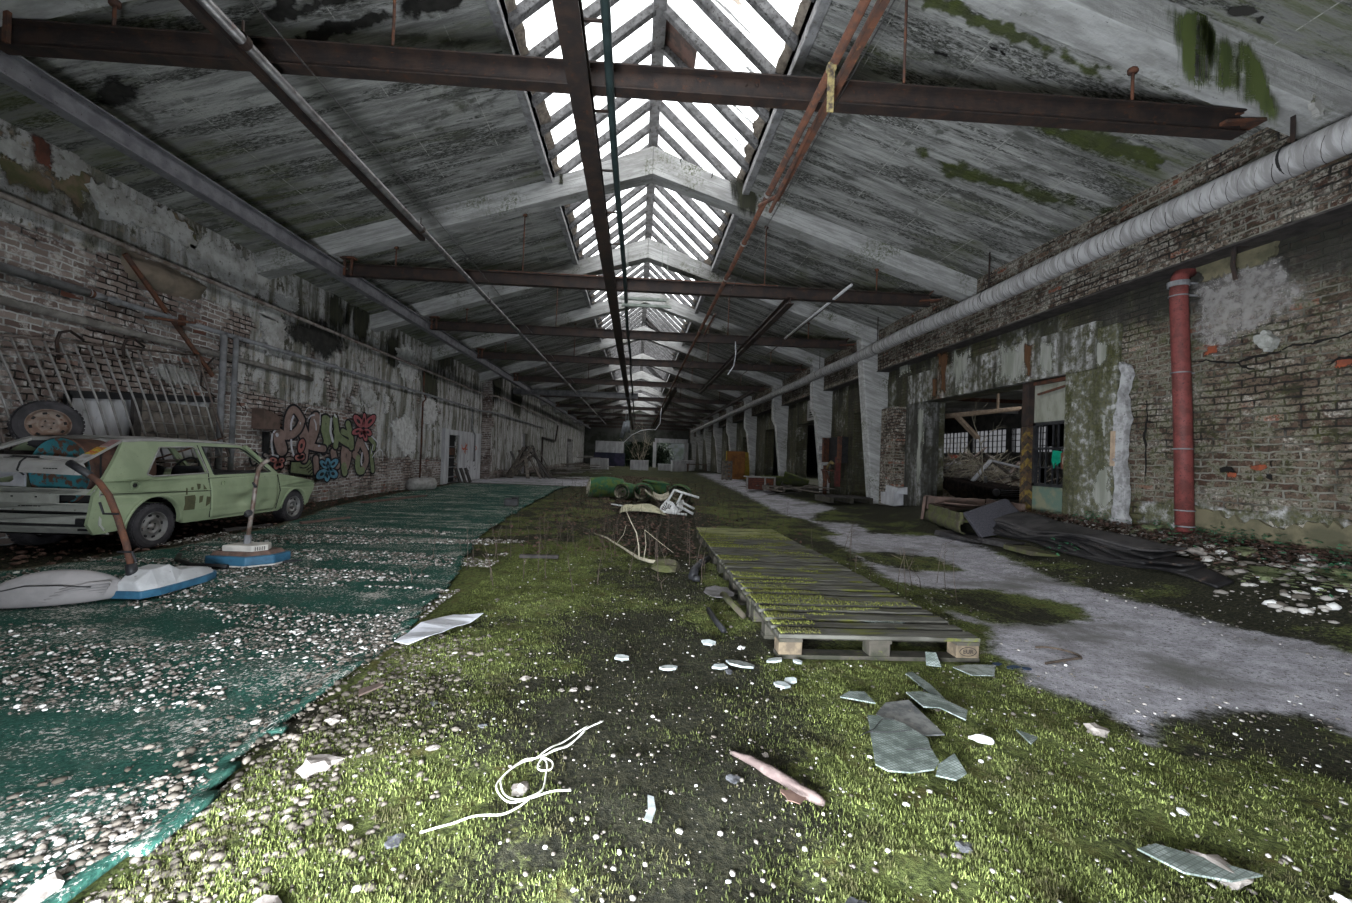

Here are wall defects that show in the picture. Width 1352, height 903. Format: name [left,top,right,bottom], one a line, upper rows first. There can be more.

water stain [264,0,462,41]
water stain [1174,11,1277,120]
peeling [0,129,299,356]
peeling [1196,241,1280,282]
water stain [1097,343,1107,365]
peeling [350,344,438,457]
water stain [1092,467,1113,508]